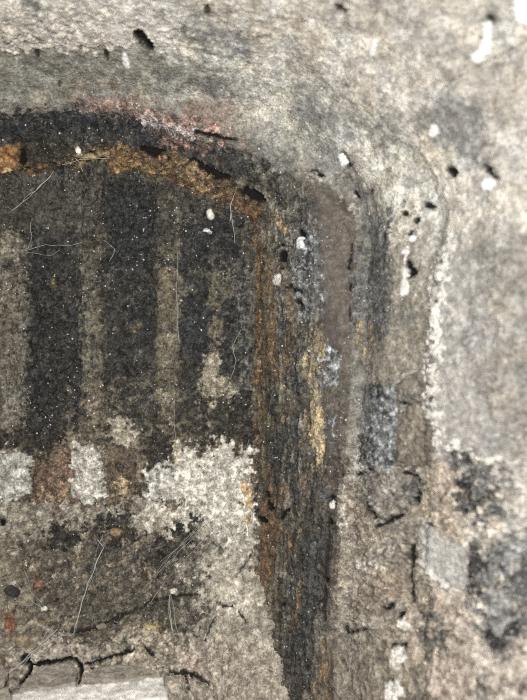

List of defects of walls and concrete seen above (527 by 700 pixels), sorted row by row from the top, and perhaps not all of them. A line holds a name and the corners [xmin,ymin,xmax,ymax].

rust [0,143,50,176]
damp [0,102,285,207]
rust [65,141,326,593]
damp [317,342,349,395]
damp [0,167,344,700]
peeling [21,625,192,693]